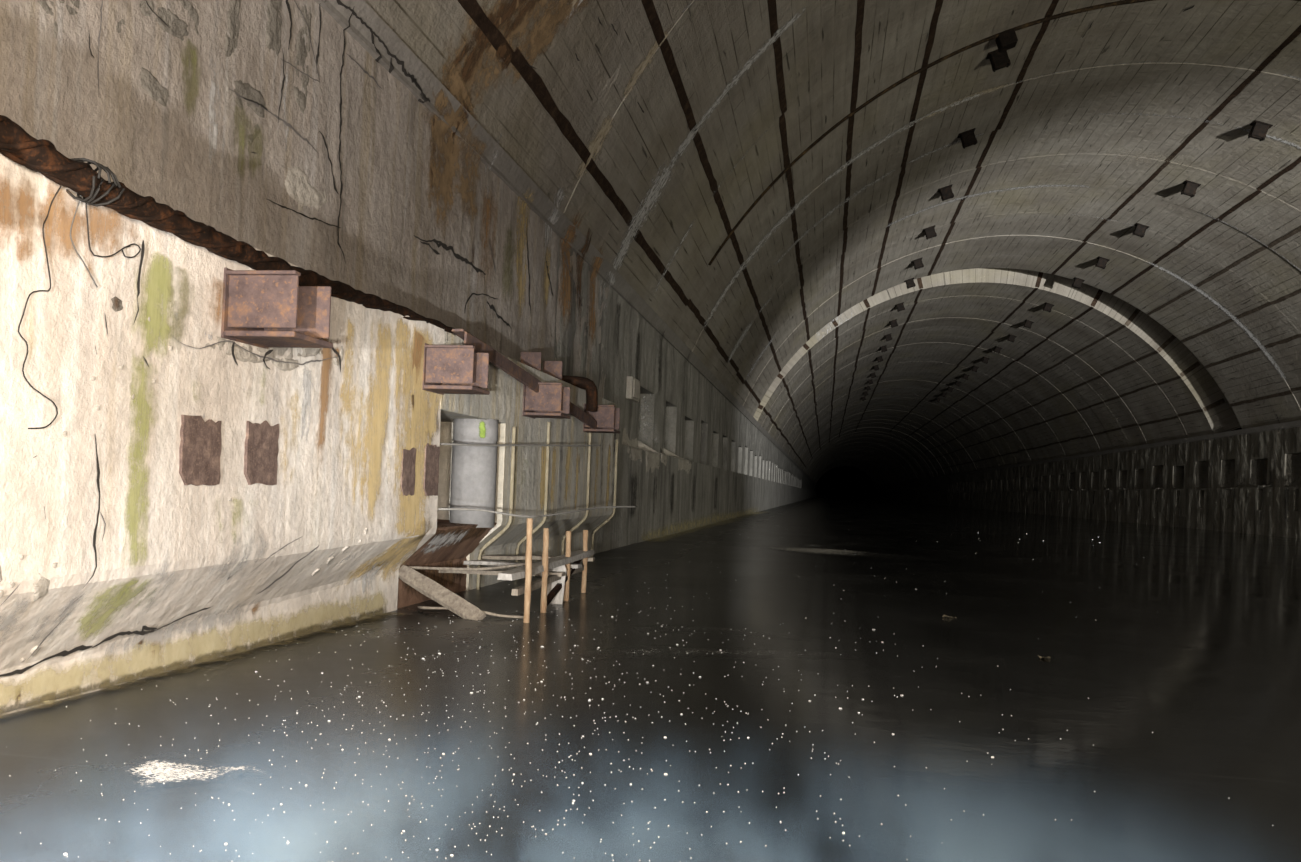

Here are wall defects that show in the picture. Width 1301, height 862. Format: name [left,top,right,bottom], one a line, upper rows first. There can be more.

rust [0,180,132,256]
crack [0,435,211,677]
water stain [127,362,151,562]
water stain [173,276,188,336]
water stain [0,564,403,718]
water stain [302,368,311,435]
crack [229,0,430,263]
rust [318,320,487,591]
rust [428,0,587,270]
rust [544,216,603,341]